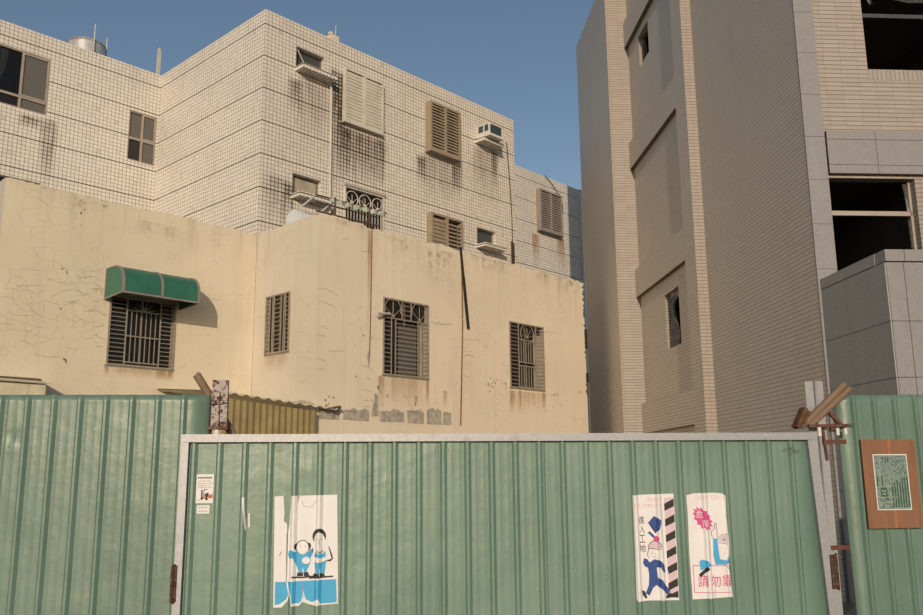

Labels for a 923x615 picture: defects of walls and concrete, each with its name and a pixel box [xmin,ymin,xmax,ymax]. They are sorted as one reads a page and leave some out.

water stain [21,115,56,168]
water stain [332,70,385,173]
water stain [417,158,462,186]
crack [0,263,109,358]